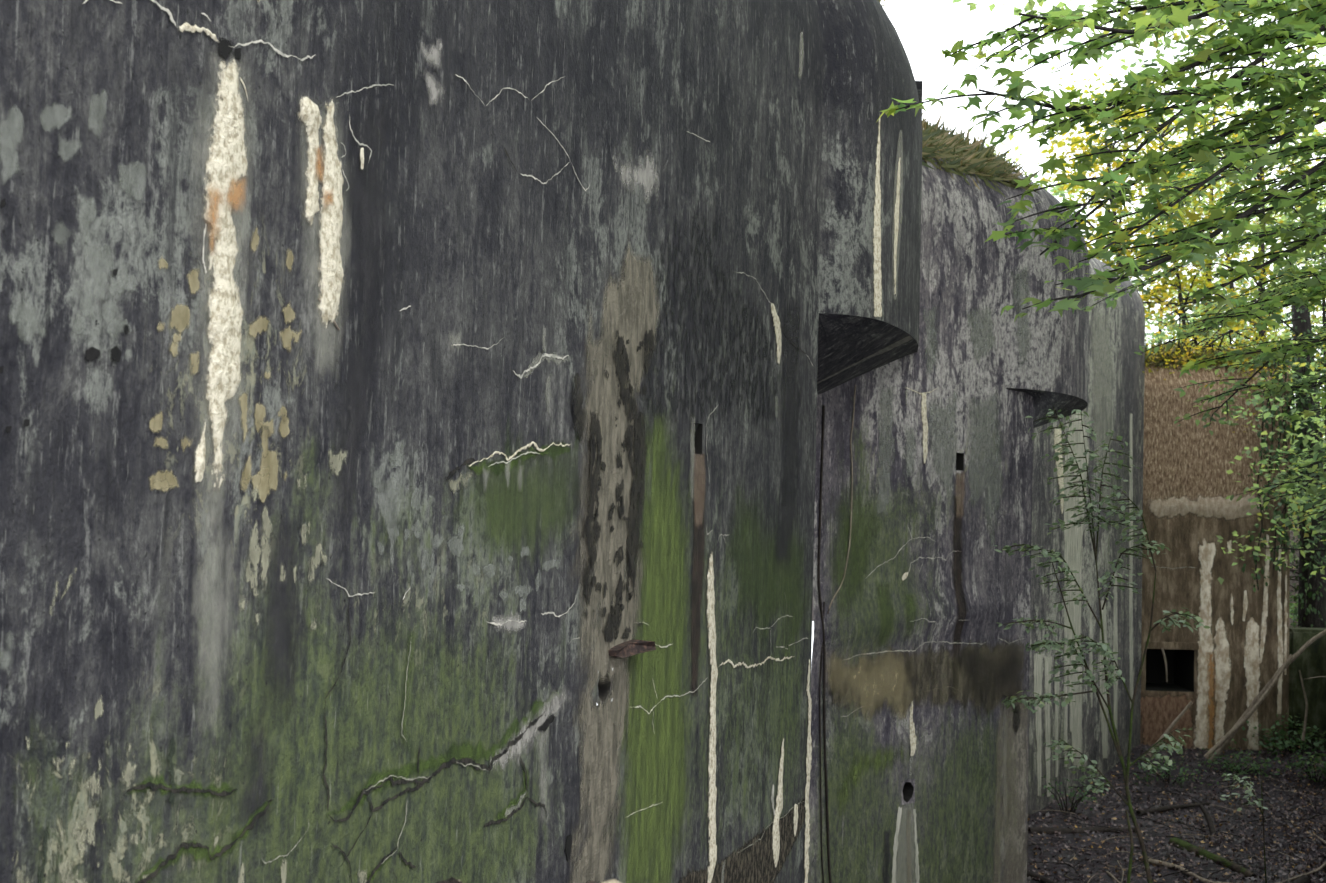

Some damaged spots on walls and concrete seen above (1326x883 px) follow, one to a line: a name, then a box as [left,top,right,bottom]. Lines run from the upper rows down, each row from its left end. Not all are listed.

crack [82,0,316,61]
crack [456,75,590,191]
crack [621,156,657,200]
crack [446,441,571,494]
corrosion [691,442,710,695]
crack [126,578,556,883]
damp [494,693,565,767]
efflorescence [706,554,718,883]
crack [634,596,808,730]
damp [771,659,812,883]
damp [829,656,917,756]
damp [883,807,920,883]